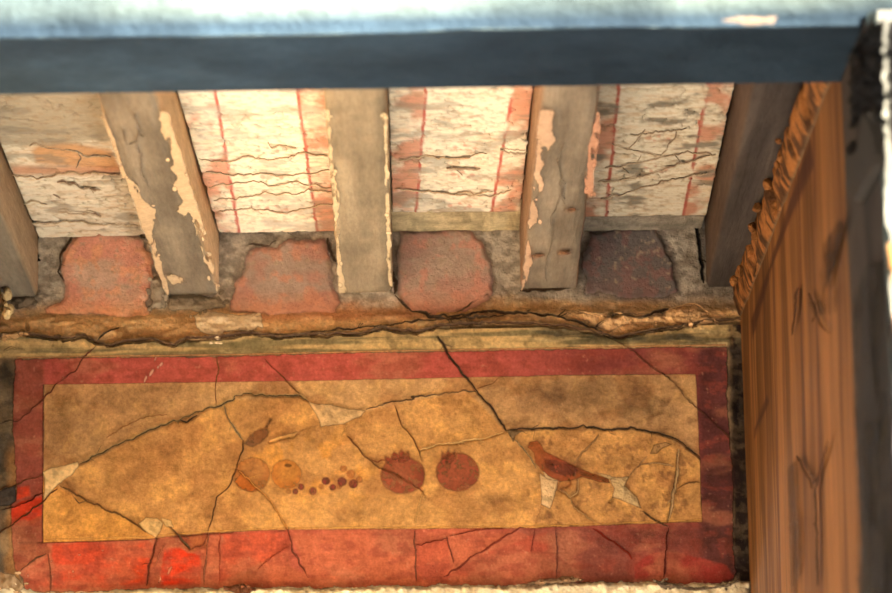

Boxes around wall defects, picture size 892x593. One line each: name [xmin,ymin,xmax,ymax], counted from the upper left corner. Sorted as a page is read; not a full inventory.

crack [12,114,148,282]
peeling [100,111,263,344]
peeling [521,241,533,290]
peeling [528,110,556,229]
peeling [584,112,601,197]
crack [598,128,716,200]
crack [0,142,741,591]